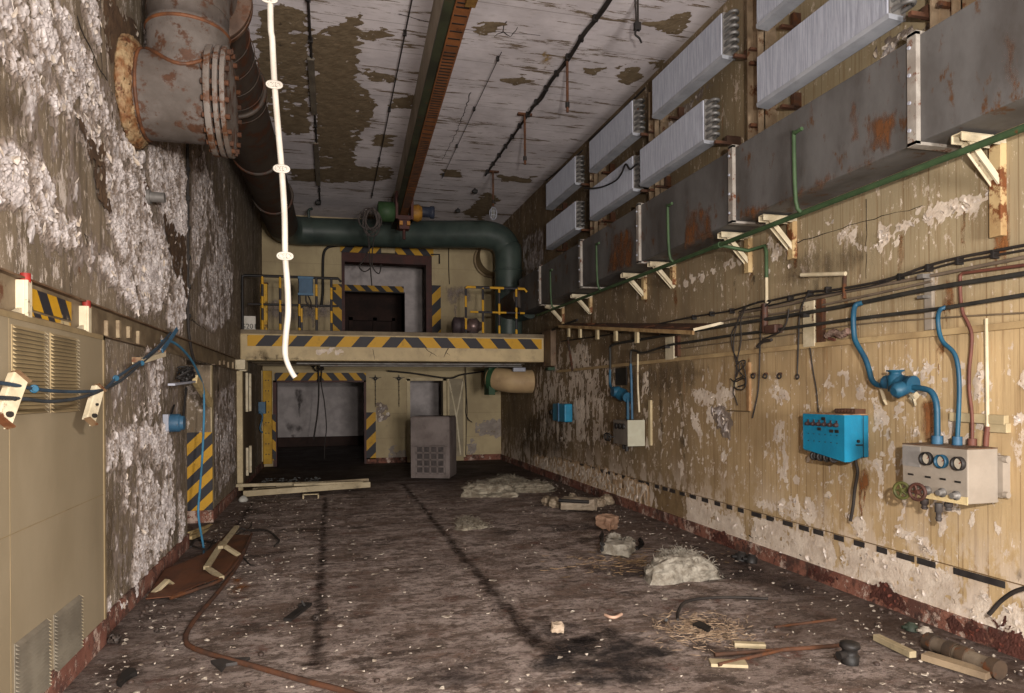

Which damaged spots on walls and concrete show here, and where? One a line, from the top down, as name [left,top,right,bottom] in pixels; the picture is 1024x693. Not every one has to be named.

spalling [471,22,508,36]
spalling [641,12,692,35]
spalling [251,3,414,184]
spalling [499,74,535,86]
spalling [583,60,665,85]
rust [872,114,894,151]
spalling [496,175,538,183]
spalling [463,192,501,220]
crack [797,199,923,266]
peeling [824,189,989,254]
peeling [0,0,236,612]
peeling [520,342,1024,661]